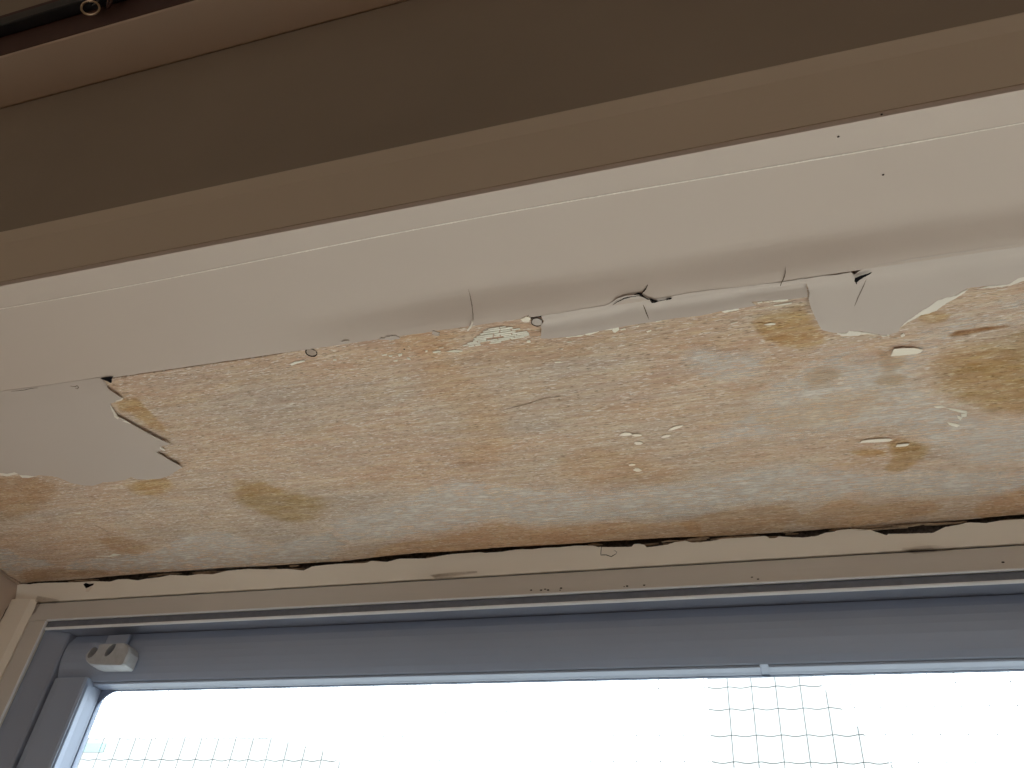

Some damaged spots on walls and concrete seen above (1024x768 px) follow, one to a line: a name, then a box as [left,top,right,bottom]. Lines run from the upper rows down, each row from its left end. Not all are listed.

crack [613,285,672,305]
peeling [425,243,1024,363]
peeling [0,377,183,486]
peeling [860,438,910,447]
crack [28,514,1024,603]
damp [72,466,1024,570]